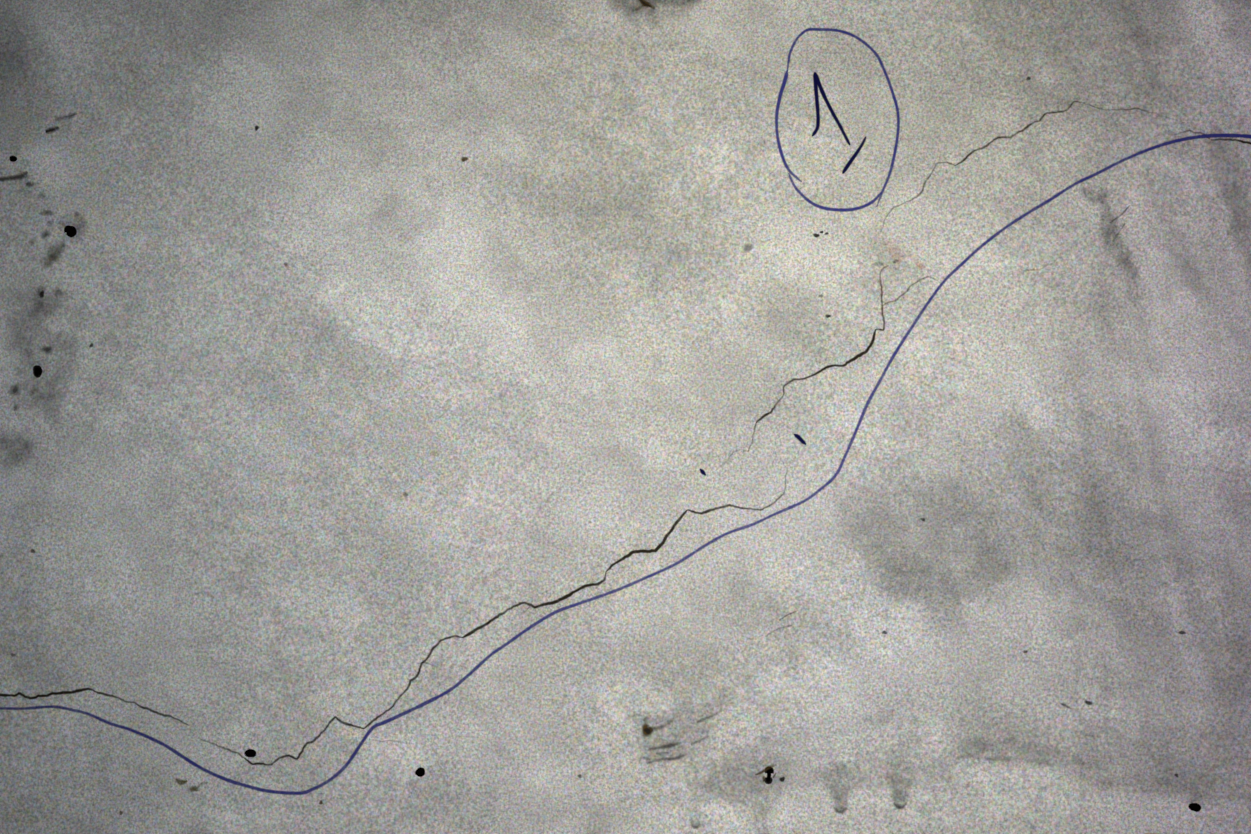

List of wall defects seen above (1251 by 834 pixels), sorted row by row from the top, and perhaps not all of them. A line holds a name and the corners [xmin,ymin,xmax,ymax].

crack [920,101,1077,194]
crack [755,286,885,426]
crack [228,496,781,765]
crack [0,688,179,720]